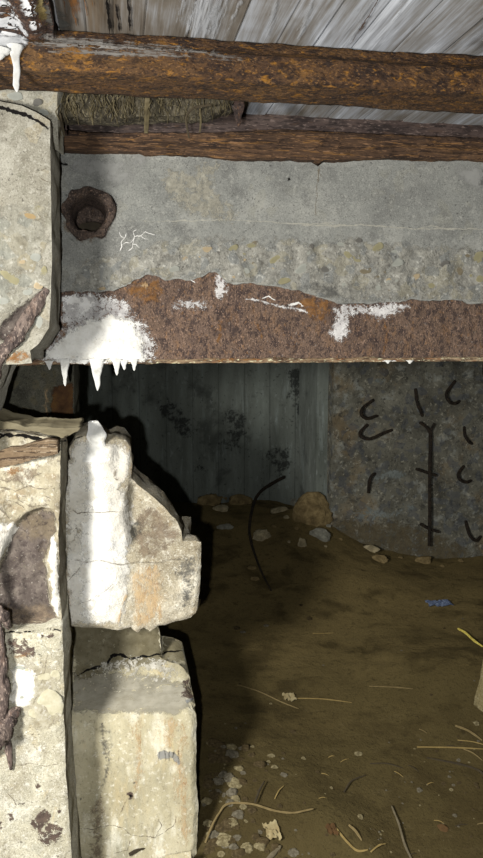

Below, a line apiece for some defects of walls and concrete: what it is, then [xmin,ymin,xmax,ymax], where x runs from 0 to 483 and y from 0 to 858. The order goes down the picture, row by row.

leakage [0,0,243,92]
leakage [43,292,158,391]
leakage [328,302,411,342]
crack [76,650,182,677]